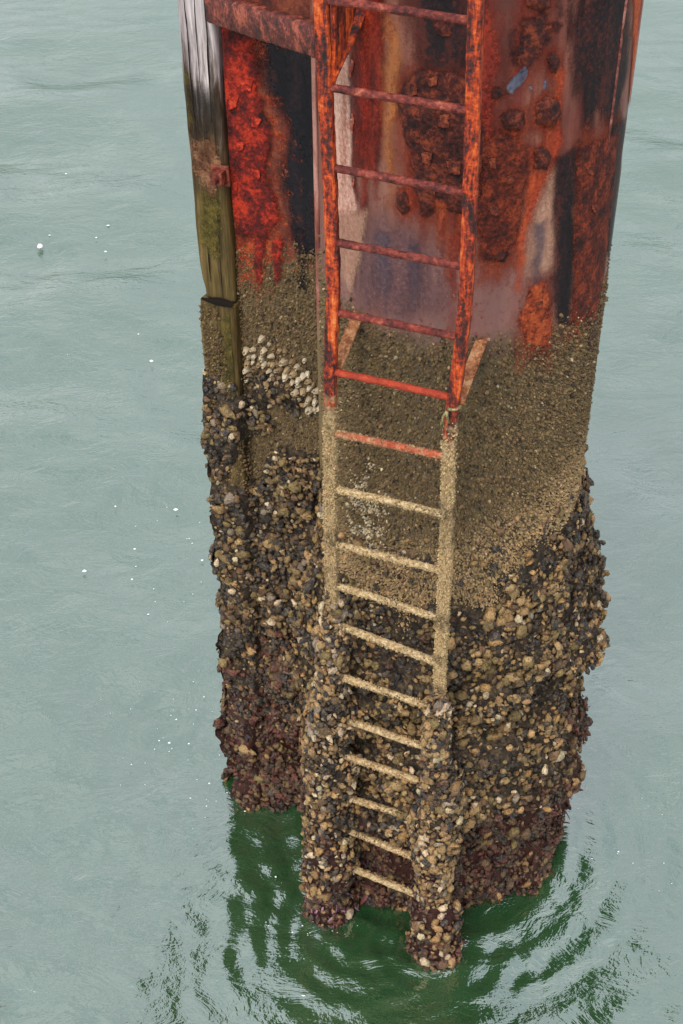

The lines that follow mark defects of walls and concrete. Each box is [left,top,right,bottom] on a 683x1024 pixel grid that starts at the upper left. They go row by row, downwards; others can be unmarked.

rust [191,27,298,294]